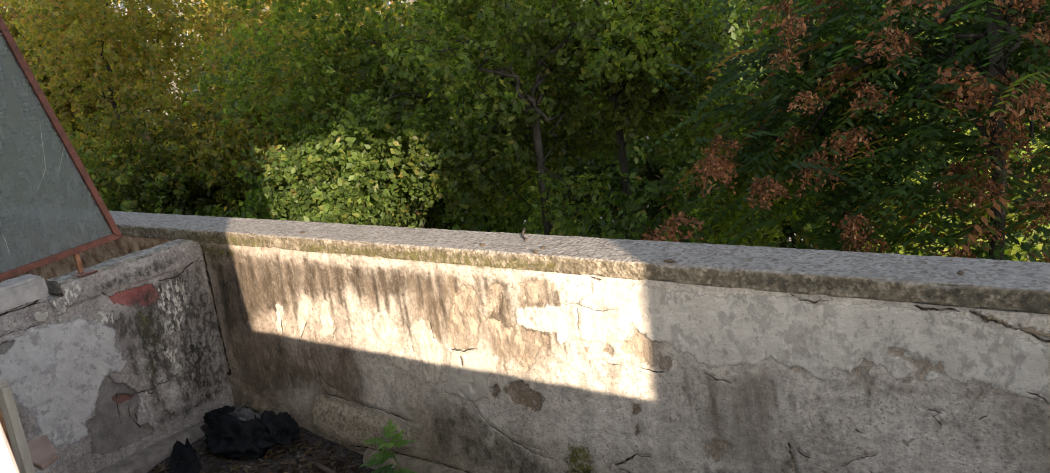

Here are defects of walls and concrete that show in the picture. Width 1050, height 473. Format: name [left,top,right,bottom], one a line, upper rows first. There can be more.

peeling [0,235,173,455]
damp [92,251,559,423]
flaking render [373,280,1050,412]
crack [914,305,1050,343]
crack [318,372,418,425]
crack [461,392,551,459]
crack [614,454,651,473]